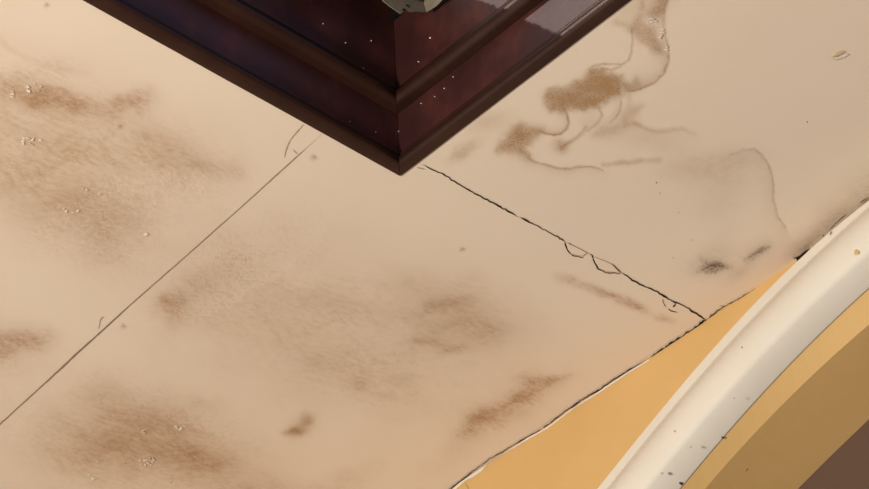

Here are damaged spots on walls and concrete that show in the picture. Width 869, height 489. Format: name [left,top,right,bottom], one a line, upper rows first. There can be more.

water stain [546,70,620,121]
crack [420,164,759,489]